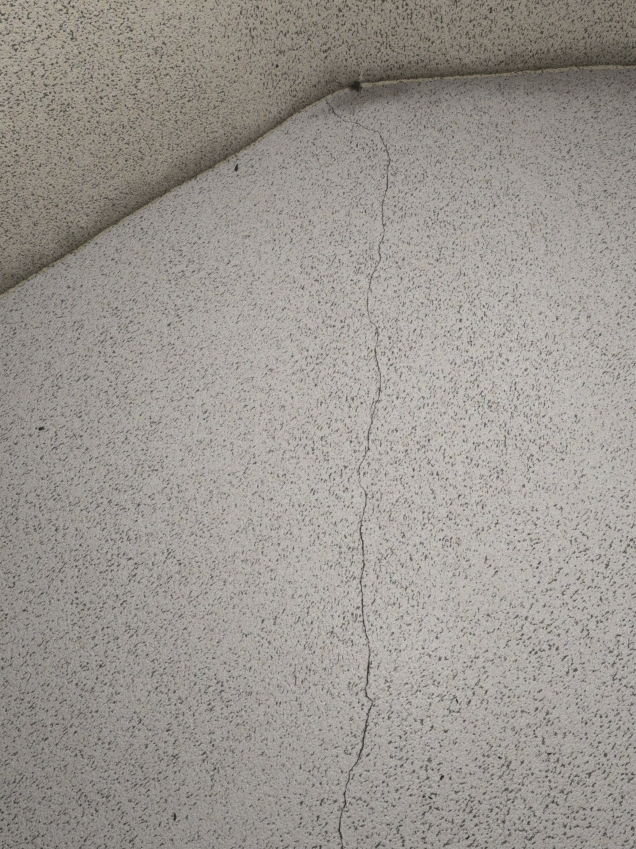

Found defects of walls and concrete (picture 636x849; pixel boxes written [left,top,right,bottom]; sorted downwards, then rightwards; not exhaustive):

crack [325,100,398,849]